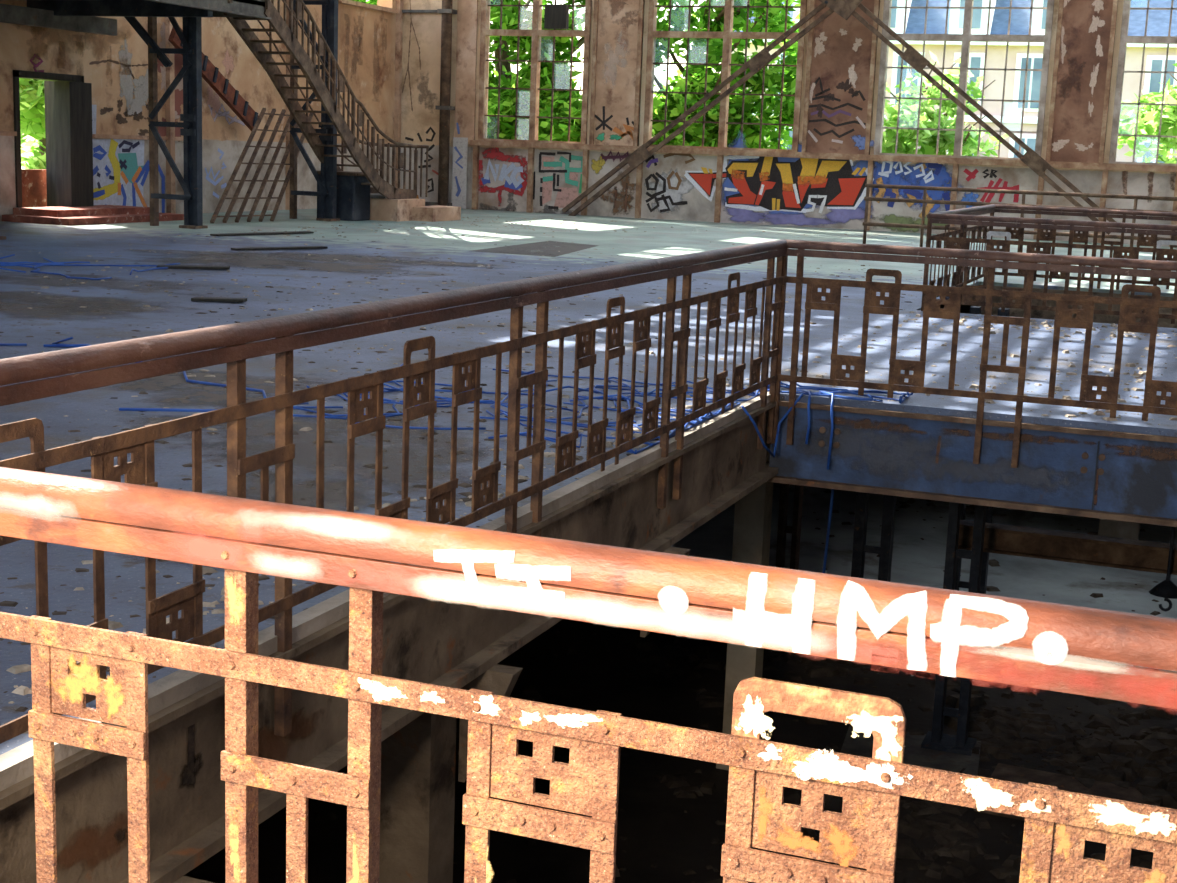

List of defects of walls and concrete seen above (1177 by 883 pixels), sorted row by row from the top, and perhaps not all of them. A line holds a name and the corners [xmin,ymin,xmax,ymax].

peeling [1088,0,1105,117]
peeling [1052,139,1093,152]
rust [819,416,925,434]
rust [935,429,1177,464]
peeling [58,656,123,718]
rust [258,708,316,760]
peeling [735,694,913,789]
rust [57,814,128,868]